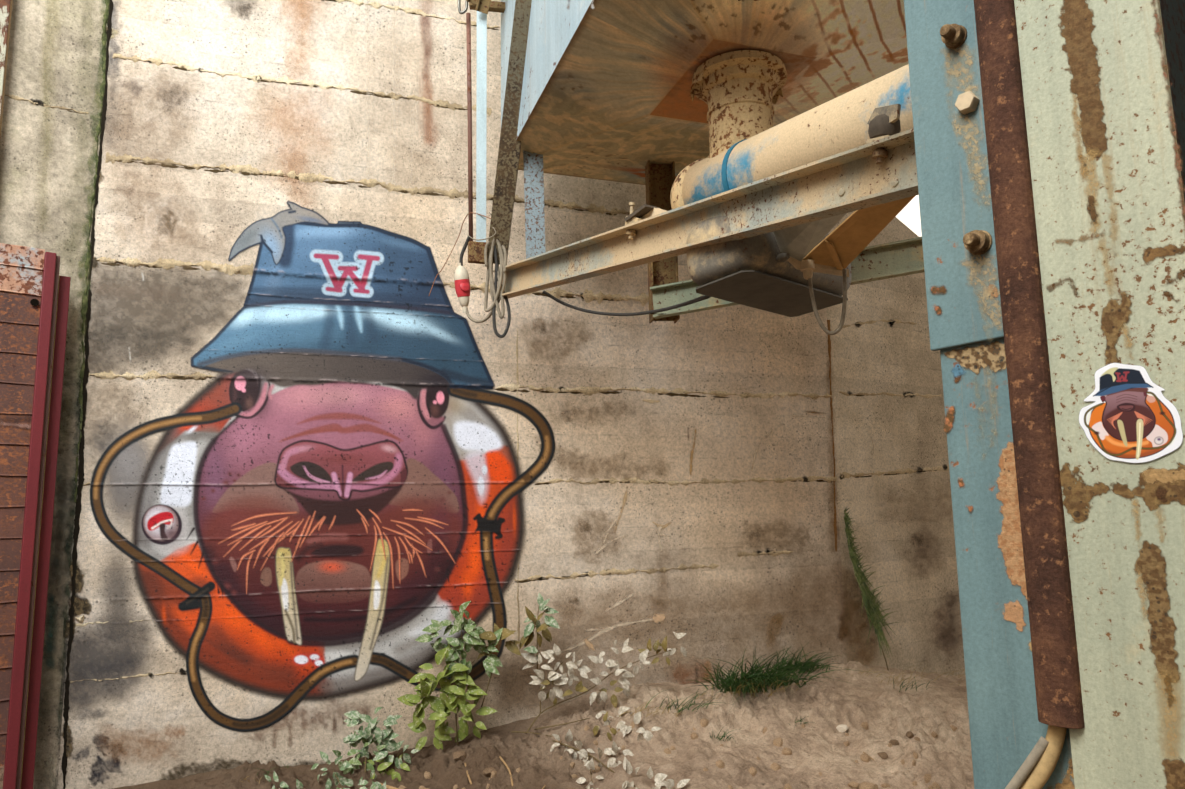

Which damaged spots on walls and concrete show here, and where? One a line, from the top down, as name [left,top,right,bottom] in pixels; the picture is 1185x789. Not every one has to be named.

corrosion [1142,244,1185,265]
corrosion [1047,278,1078,295]
corrosion [1163,269,1185,302]
crack [57,0,113,789]
peeling [996,442,1032,651]